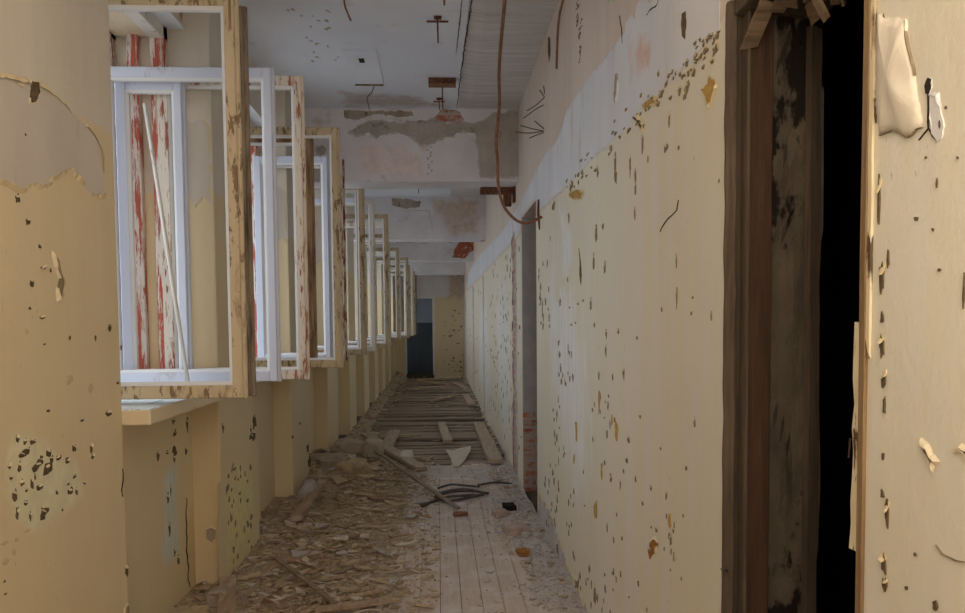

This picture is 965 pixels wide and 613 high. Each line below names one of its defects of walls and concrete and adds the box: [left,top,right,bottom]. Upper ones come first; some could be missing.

peeling [0,73,106,203]
spalling [344,109,518,179]
peeling [391,197,422,210]
peeling [442,0,721,478]
spalling [0,433,76,565]
spalling [226,463,253,564]
spalling [491,502,517,519]
spalling [648,513,684,581]
crack [935,545,964,562]